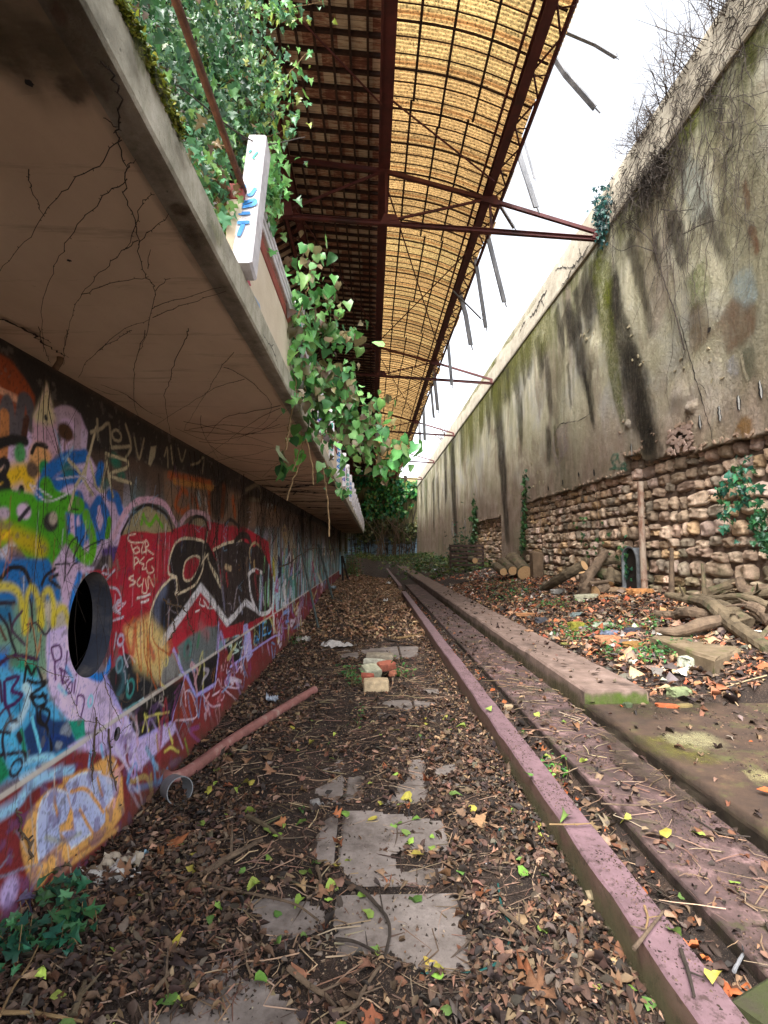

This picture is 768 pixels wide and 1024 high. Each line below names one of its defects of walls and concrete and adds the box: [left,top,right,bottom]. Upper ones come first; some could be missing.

water stain [668,210,684,264]
water stain [627,239,647,312]
crack [0,319,68,357]
water stain [556,268,655,463]
water stain [417,337,550,541]
spalling [622,420,768,457]